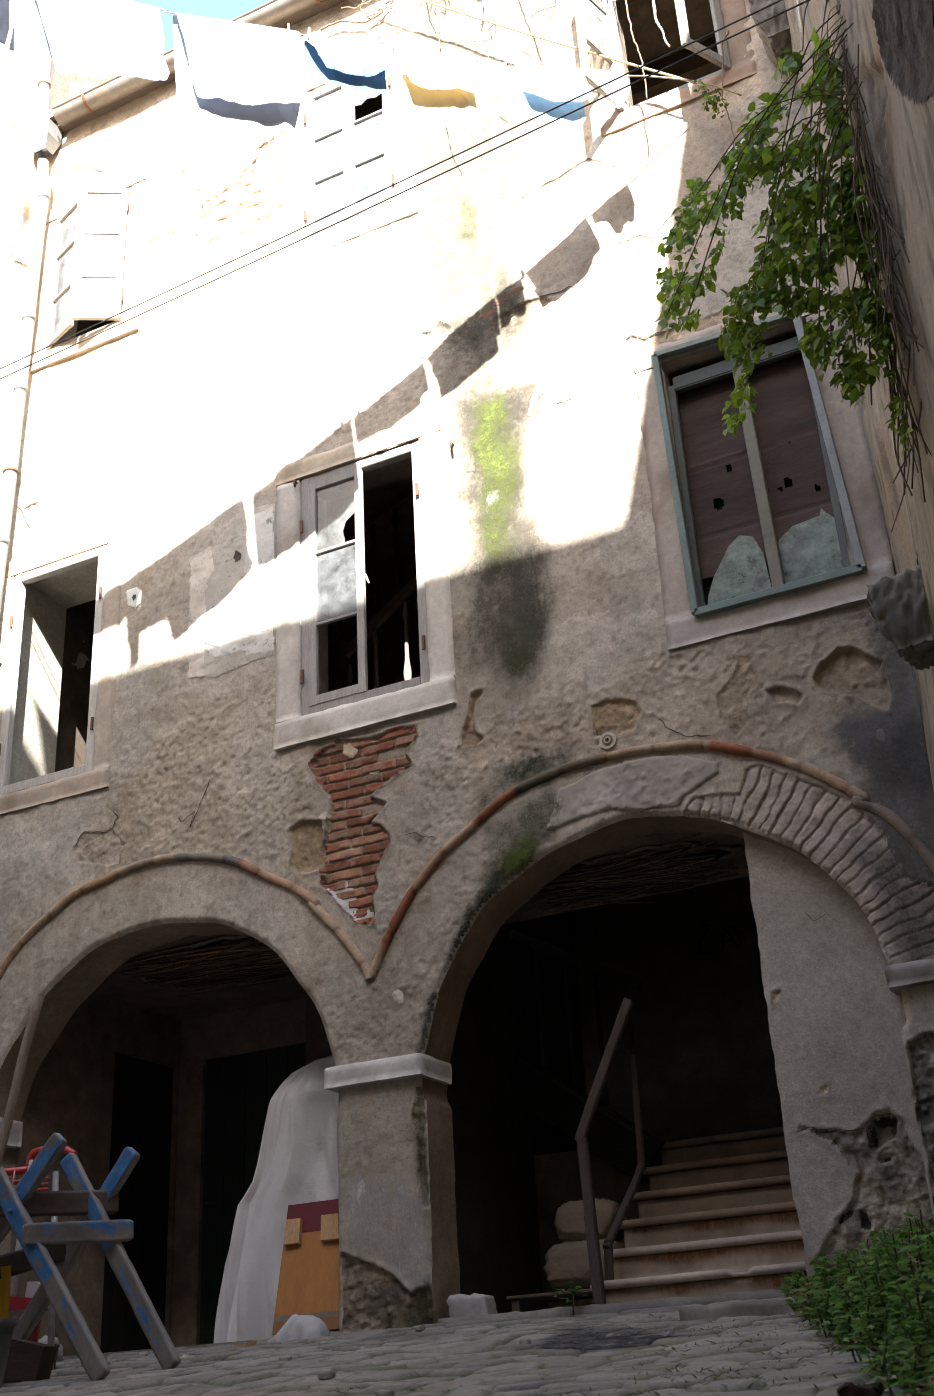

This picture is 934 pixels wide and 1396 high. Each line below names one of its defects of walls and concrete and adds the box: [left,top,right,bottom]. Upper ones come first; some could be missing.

peeling [157,131,307,358]
spalling [413,321,451,356]
water stain [412,0,565,679]
peeling [187,504,275,678]
spalling [459,688,483,747]
spalling [717,646,892,736]
flaking render [289,725,418,924]
flaking render [546,698,934,965]
spalling [411,1087,429,1208]
spalling [811,1031,934,1272]
spalling [340,1253,433,1333]